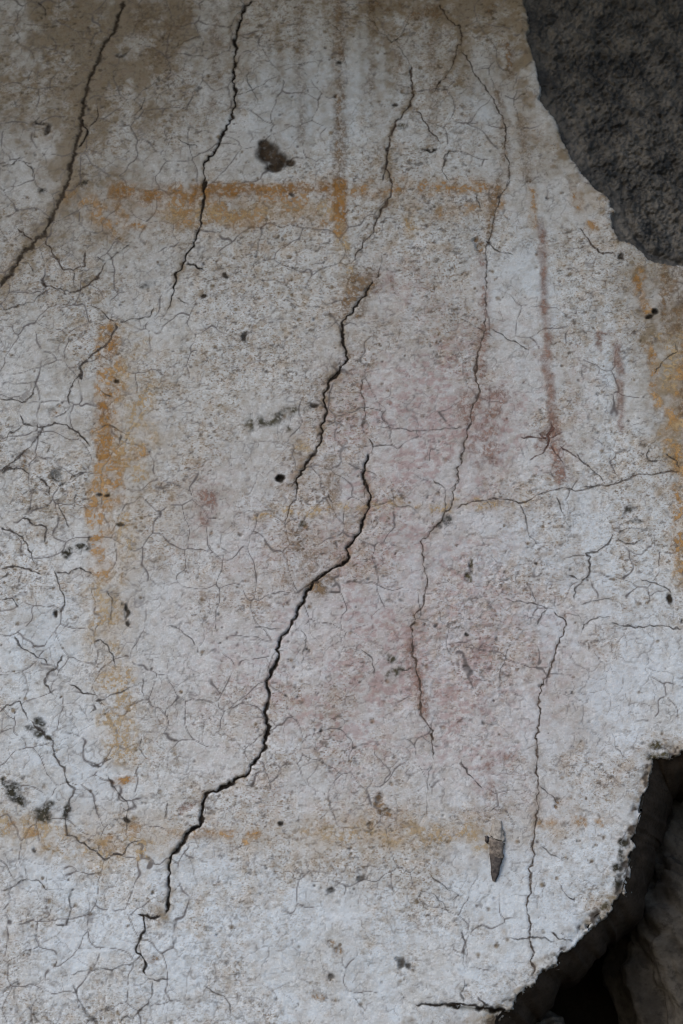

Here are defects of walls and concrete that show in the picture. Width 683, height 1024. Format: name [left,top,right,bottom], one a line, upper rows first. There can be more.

rust [85,324,152,578]
crack [0,1,253,612]
rust [145,182,335,227]
rust [418,182,505,211]
crack [355,6,679,755]
flaking render [524,0,683,267]
crack [1,701,137,860]
crack [15,637,144,711]
crack [75,272,442,1022]
crack [416,982,505,1013]
spalling [495,751,683,1024]
crack [506,530,680,973]